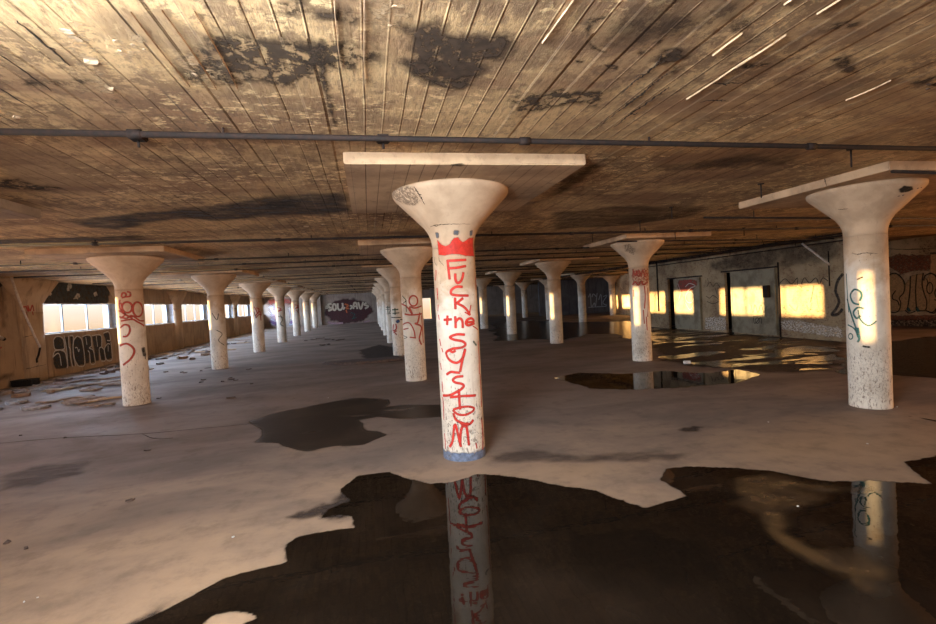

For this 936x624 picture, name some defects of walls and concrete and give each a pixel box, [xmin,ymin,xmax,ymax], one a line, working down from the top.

crack [17,21,70,66]
damp [180,34,378,124]
damp [400,23,510,89]
damp [512,89,603,111]
damp [646,18,689,72]
damp [832,55,855,73]
damp [0,179,60,191]